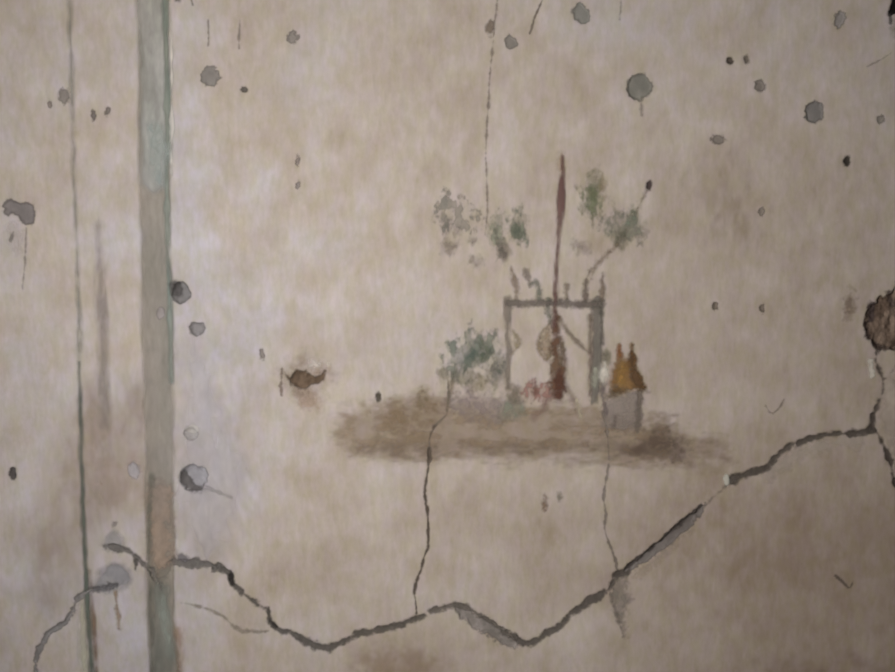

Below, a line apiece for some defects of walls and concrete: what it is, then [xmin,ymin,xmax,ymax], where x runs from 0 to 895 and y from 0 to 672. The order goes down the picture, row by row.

crack [486,15,496,74]
spalling [2,199,35,225]
spalling [863,288,895,351]
spalling [279,362,326,396]
crack [723,350,895,487]
crack [34,384,706,672]